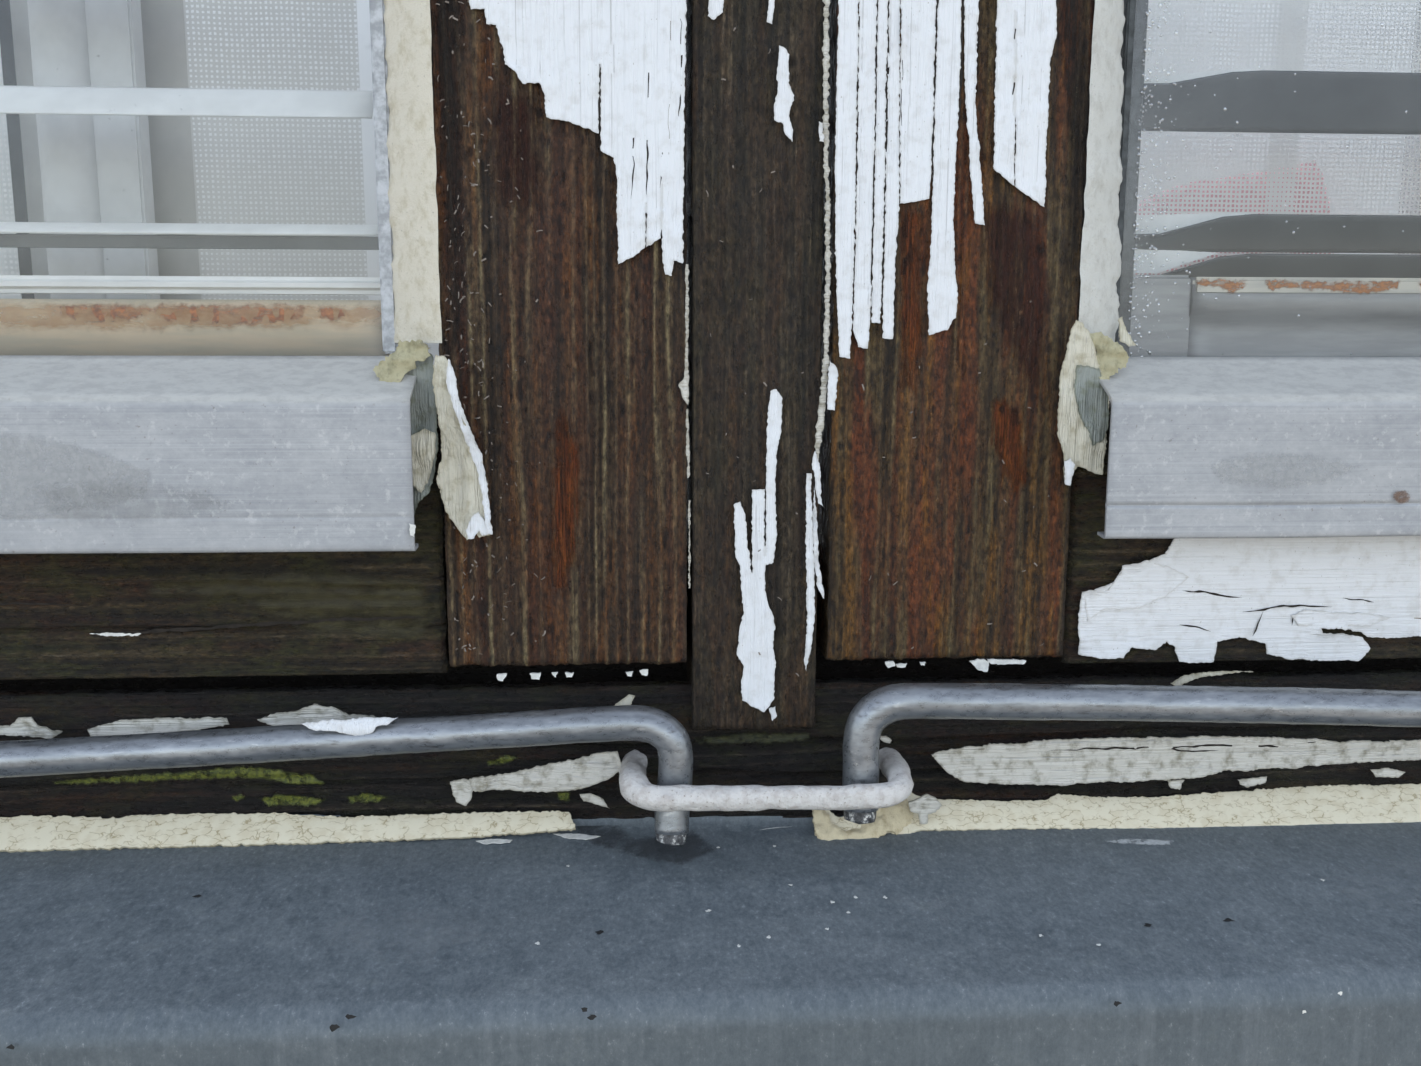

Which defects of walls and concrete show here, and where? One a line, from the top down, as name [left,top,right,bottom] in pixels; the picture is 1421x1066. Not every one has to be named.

peeling [774,46,794,141]
peeling [469,0,690,478]
rust [0,304,381,327]
peeling [804,0,1057,669]
rust [1197,278,1244,293]
rust [1266,280,1399,294]
peeling [733,389,783,721]
peeling [1078,536,1421,685]
crack [1182,590,1372,635]
peeling [257,703,398,736]
peeling [450,751,621,809]
peeling [931,735,1421,790]